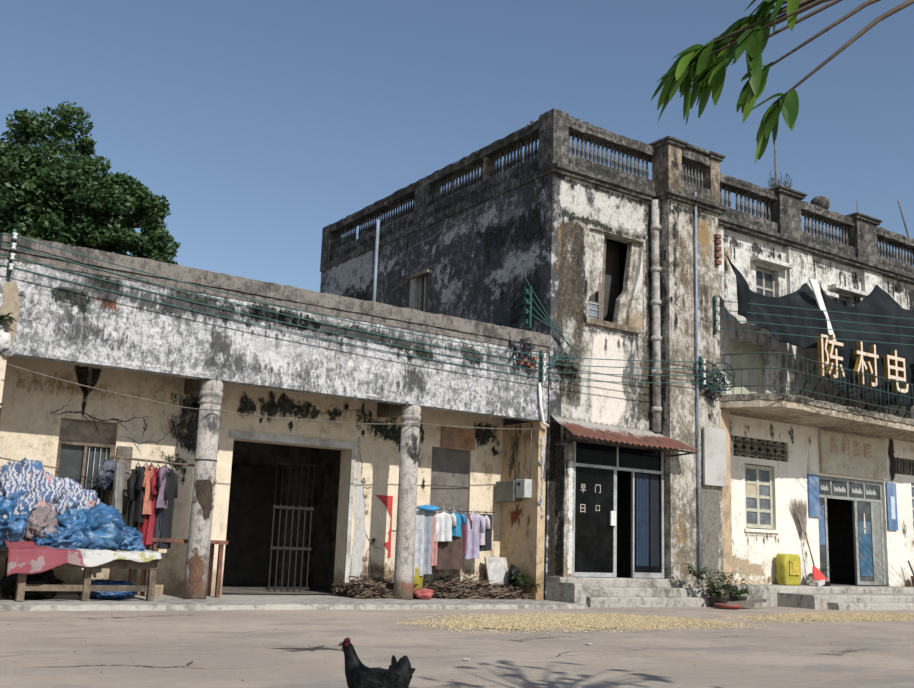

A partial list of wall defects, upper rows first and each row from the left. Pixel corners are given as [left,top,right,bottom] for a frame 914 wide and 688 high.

water stain [724,235,785,297]
water stain [882,281,914,311]
water stain [17,268,522,488]
water stain [428,161,719,576]
crack [47,404,175,450]
spalling [193,476,217,519]